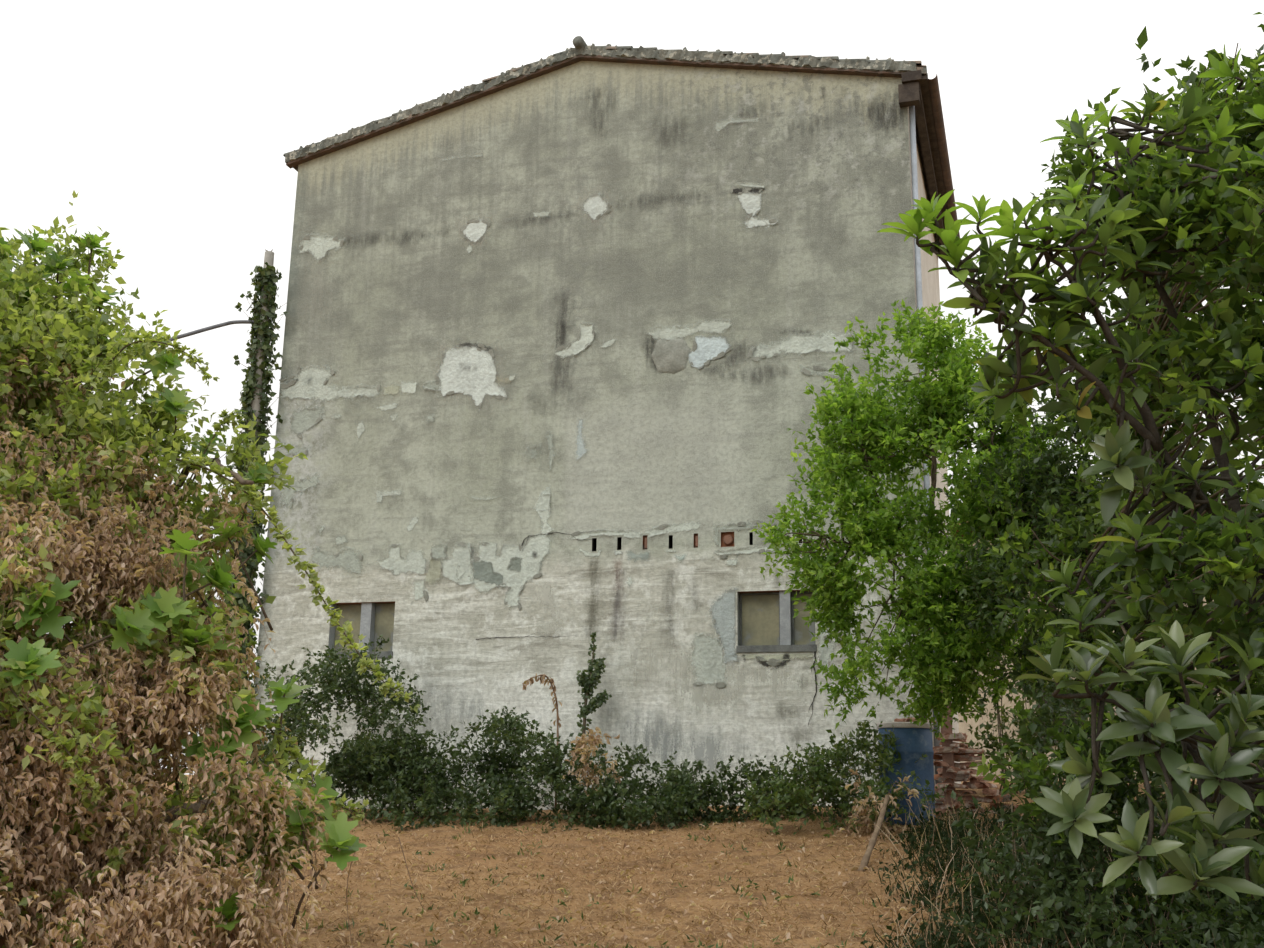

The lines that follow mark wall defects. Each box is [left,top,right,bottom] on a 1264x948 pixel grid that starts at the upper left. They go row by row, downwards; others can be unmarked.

spalling [579,193,612,223]
spalling [730,183,778,228]
spalling [299,234,344,261]
spalling [460,217,491,253]
spalling [555,323,615,359]
spalling [649,320,854,382]
spalling [279,343,515,456]
peeling [568,519,775,565]
peeling [312,535,557,634]